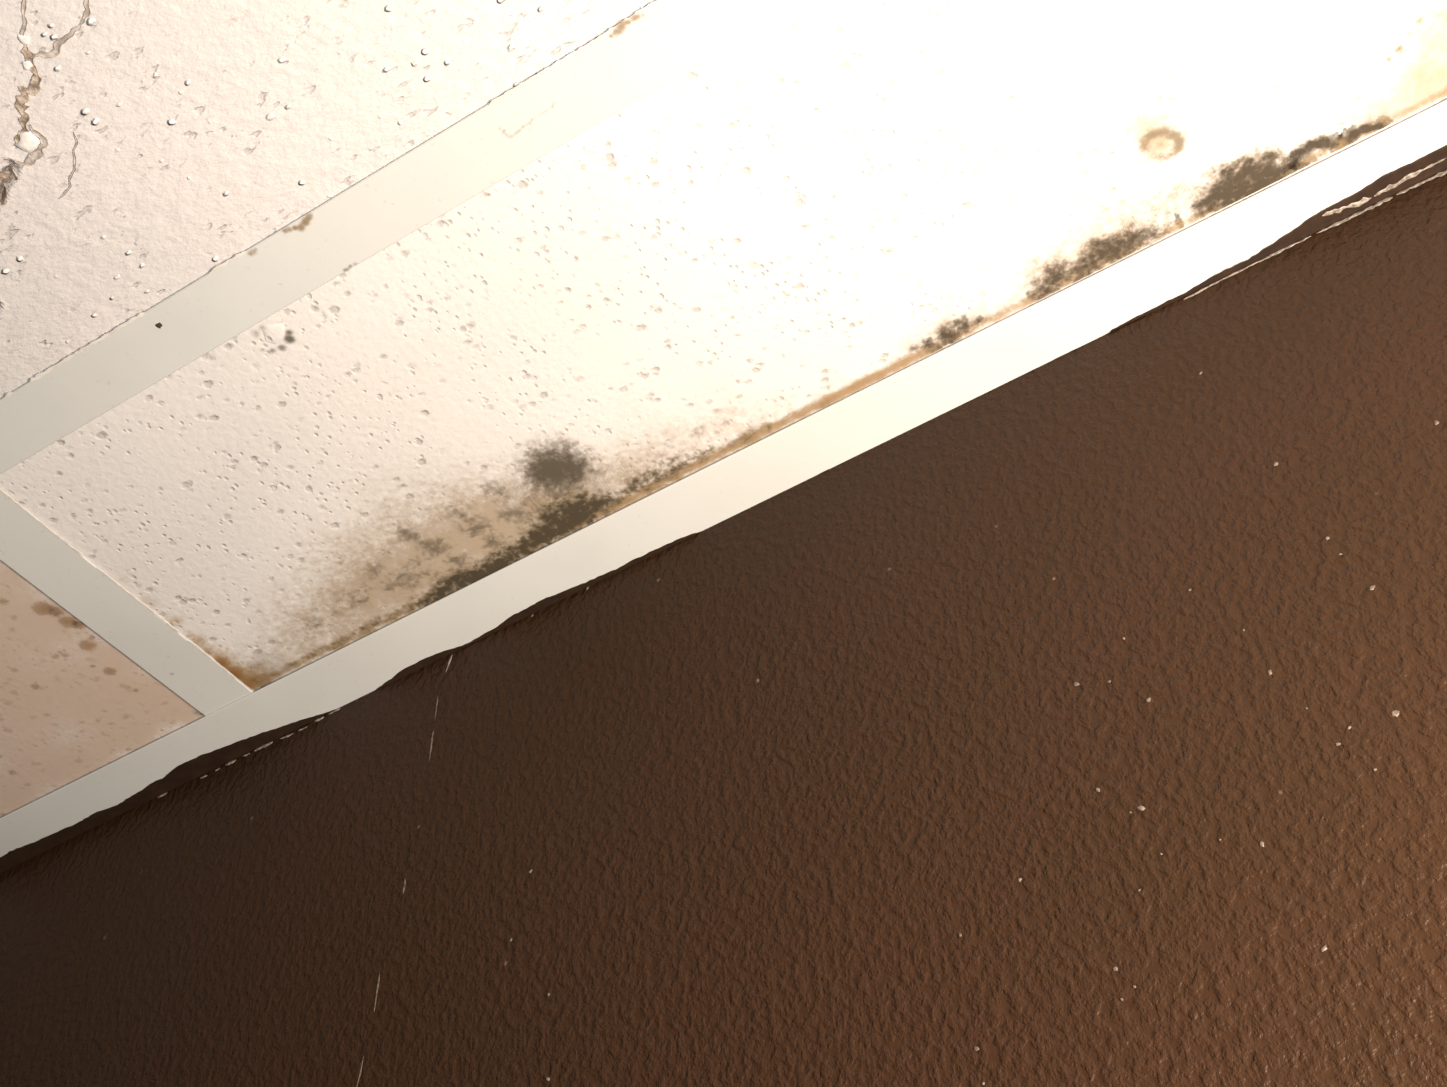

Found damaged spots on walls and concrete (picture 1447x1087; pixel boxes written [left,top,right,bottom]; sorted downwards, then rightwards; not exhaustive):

crack [0,0,91,211]
water stain [254,120,1388,686]
water stain [0,569,205,814]